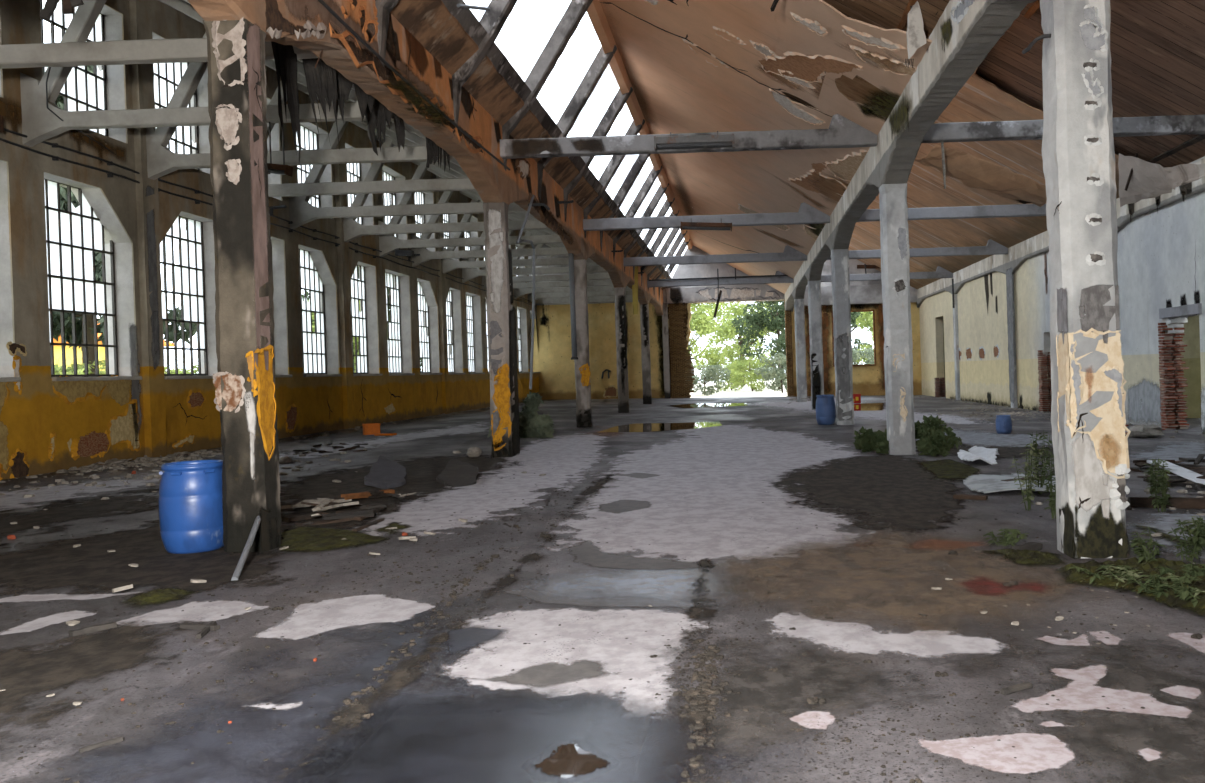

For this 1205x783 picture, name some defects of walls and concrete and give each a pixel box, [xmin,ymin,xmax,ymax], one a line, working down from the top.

peeling [215,104,242,185]
peeling [211,17,247,86]
flaking render [265,0,485,155]
crack [601,0,832,117]
peeling [769,88,826,125]
peeling [713,12,917,89]
peeling [787,149,869,196]
peeling [0,341,29,479]
peeling [48,399,141,461]
peeling [1056,328,1131,510]